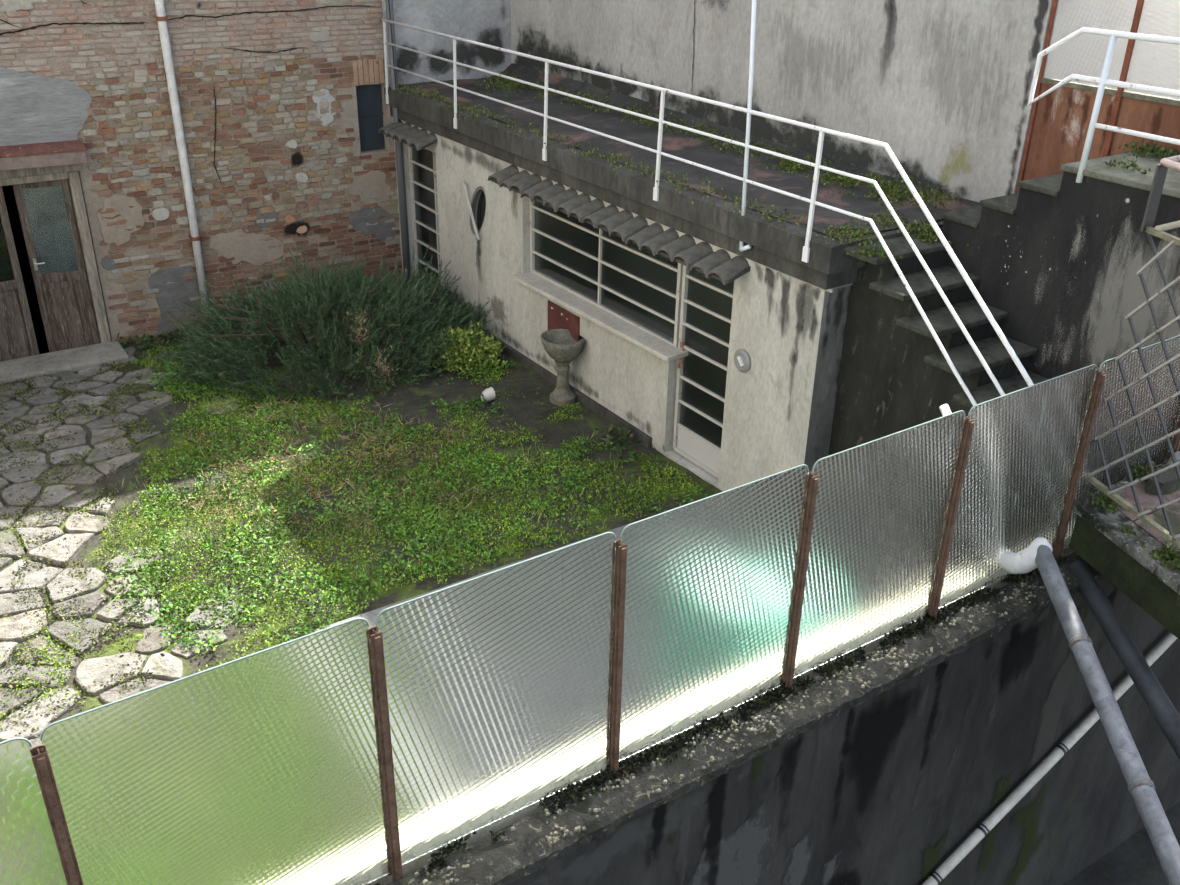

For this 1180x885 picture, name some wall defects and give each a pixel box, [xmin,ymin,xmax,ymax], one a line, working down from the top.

crack [0,0,374,35]
crack [226,46,304,54]
water stain [396,29,965,197]
water stain [885,0,896,51]
water stain [1007,0,1048,195]
rust [1066,94,1089,134]
water stain [756,264,850,368]
water stain [990,607,1060,720]
water stain [814,662,947,817]
water stain [1009,658,1075,885]
water stain [923,832,949,882]
water stain [979,825,998,869]